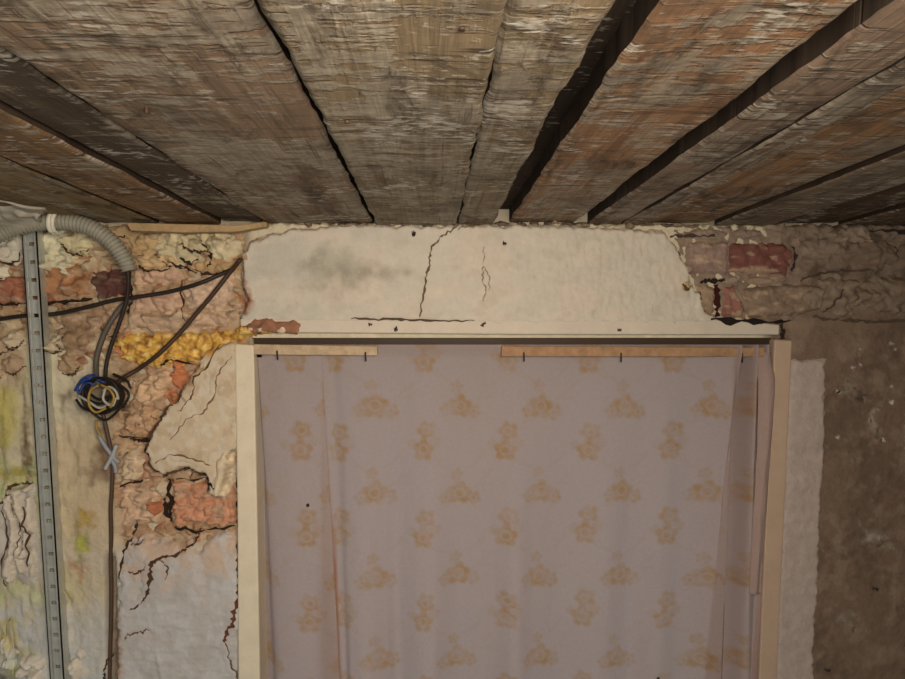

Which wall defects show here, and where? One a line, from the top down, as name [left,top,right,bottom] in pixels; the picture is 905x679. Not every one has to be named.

crack [351,224,491,327]
spalling [670,226,818,339]
spalling [0,226,301,544]
crack [144,341,232,492]
crack [103,521,201,679]
crack [219,543,238,679]